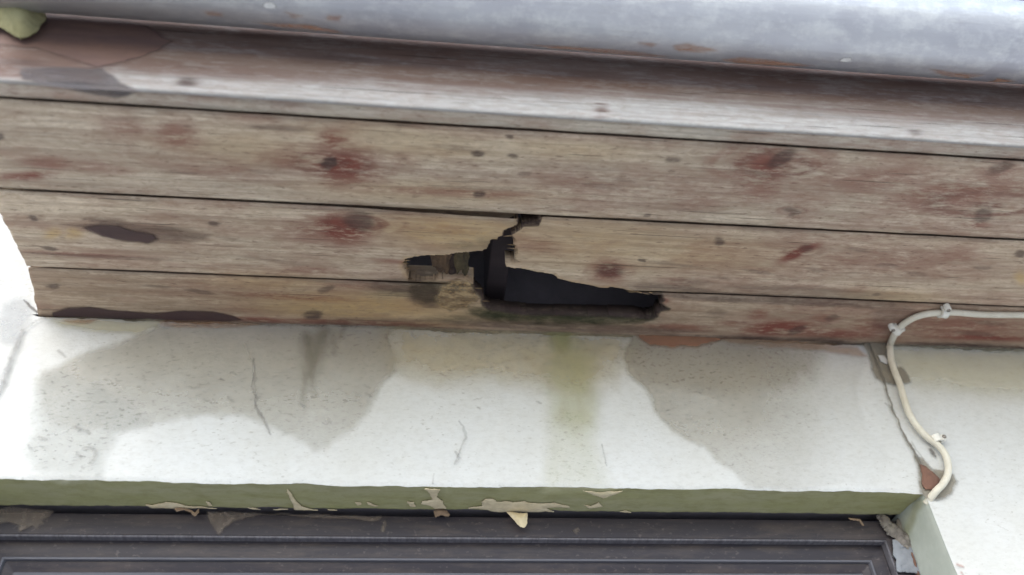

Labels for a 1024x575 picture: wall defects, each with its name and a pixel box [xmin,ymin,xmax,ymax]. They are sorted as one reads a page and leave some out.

peeling [437,280,480,310]
damp [34,307,781,463]
crack [864,343,922,464]
peeling [145,501,217,517]
peeling [273,489,337,511]
peeling [407,488,450,518]
peeling [468,499,570,528]